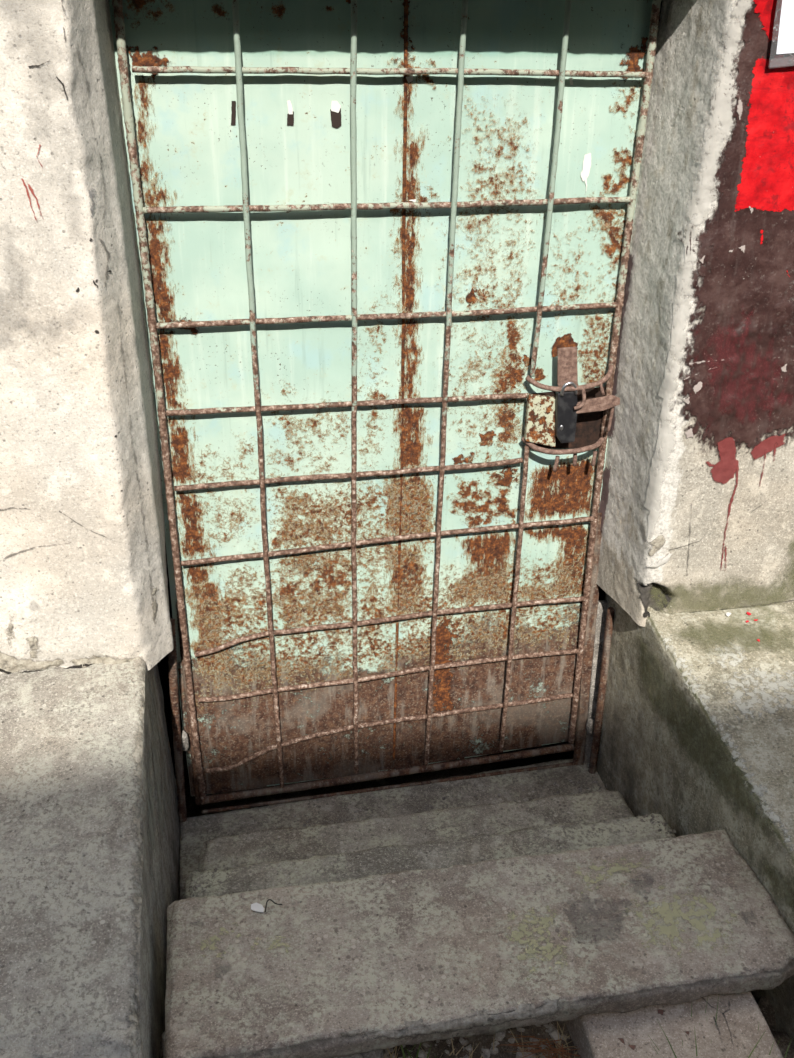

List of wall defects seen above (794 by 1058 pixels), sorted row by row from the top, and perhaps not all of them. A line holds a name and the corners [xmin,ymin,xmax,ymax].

rust [125,0,597,796]
rust [548,37,649,384]